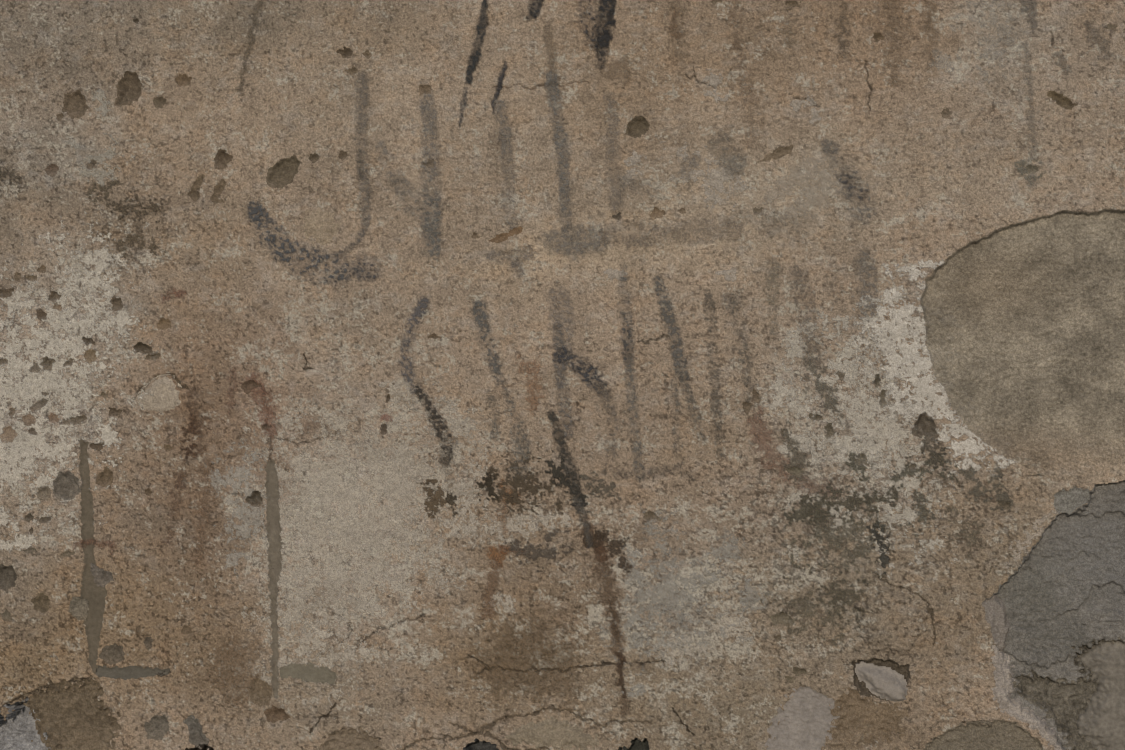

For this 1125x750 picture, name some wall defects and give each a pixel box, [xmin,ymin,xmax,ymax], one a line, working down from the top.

spalling [924,480,1125,750]
spalling [0,675,123,750]
crack [309,703,695,750]
spalling [821,658,910,750]